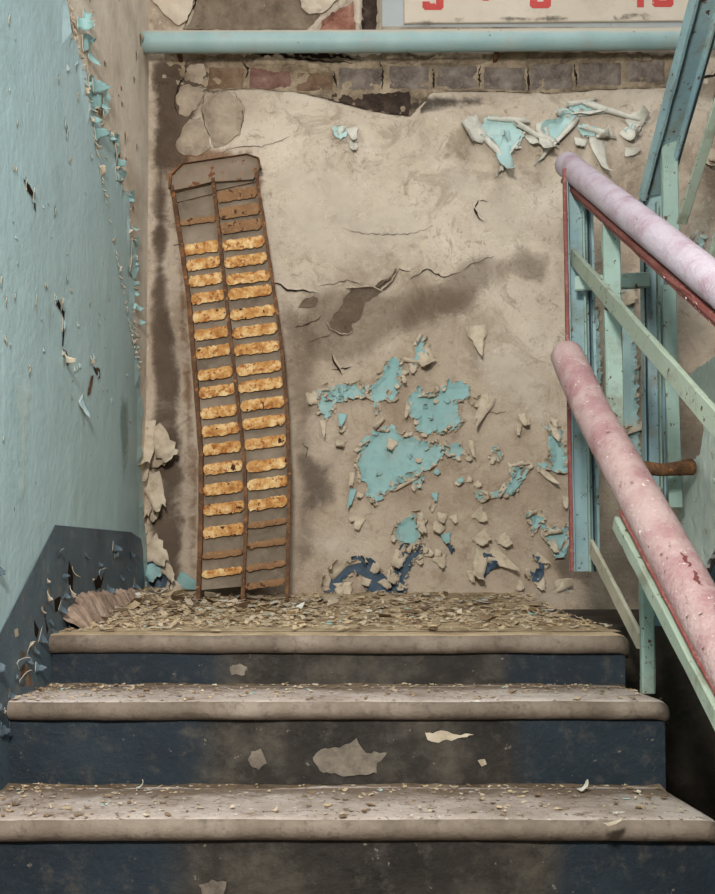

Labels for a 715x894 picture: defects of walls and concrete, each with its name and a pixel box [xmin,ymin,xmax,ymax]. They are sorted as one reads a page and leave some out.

flaking render [152,0,356,30]
peeling [58,0,147,373]
flaking render [165,51,674,177]
peeling [35,272,100,419]
water stain [150,61,209,581]
flaking render [326,268,399,336]
peeling [465,324,487,356]
peeling [305,332,496,594]
peeling [454,417,574,593]
peeling [0,418,196,740]
spalling [313,738,387,777]
spalling [425,730,473,743]